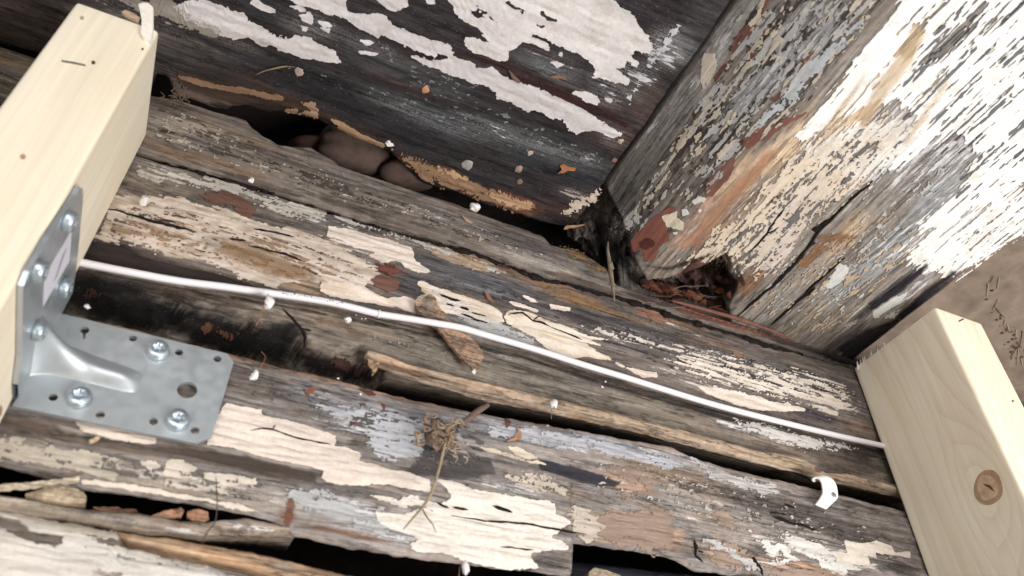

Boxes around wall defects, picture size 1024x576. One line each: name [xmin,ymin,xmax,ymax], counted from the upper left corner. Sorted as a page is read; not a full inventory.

peeling [156,113,358,202]
peeling [119,0,681,163]
peeling [623,0,1024,333]
peeling [94,163,859,454]
crack [410,180,873,356]
peeling [75,414,157,445]
crack [437,502,587,551]
peeling [191,403,911,576]